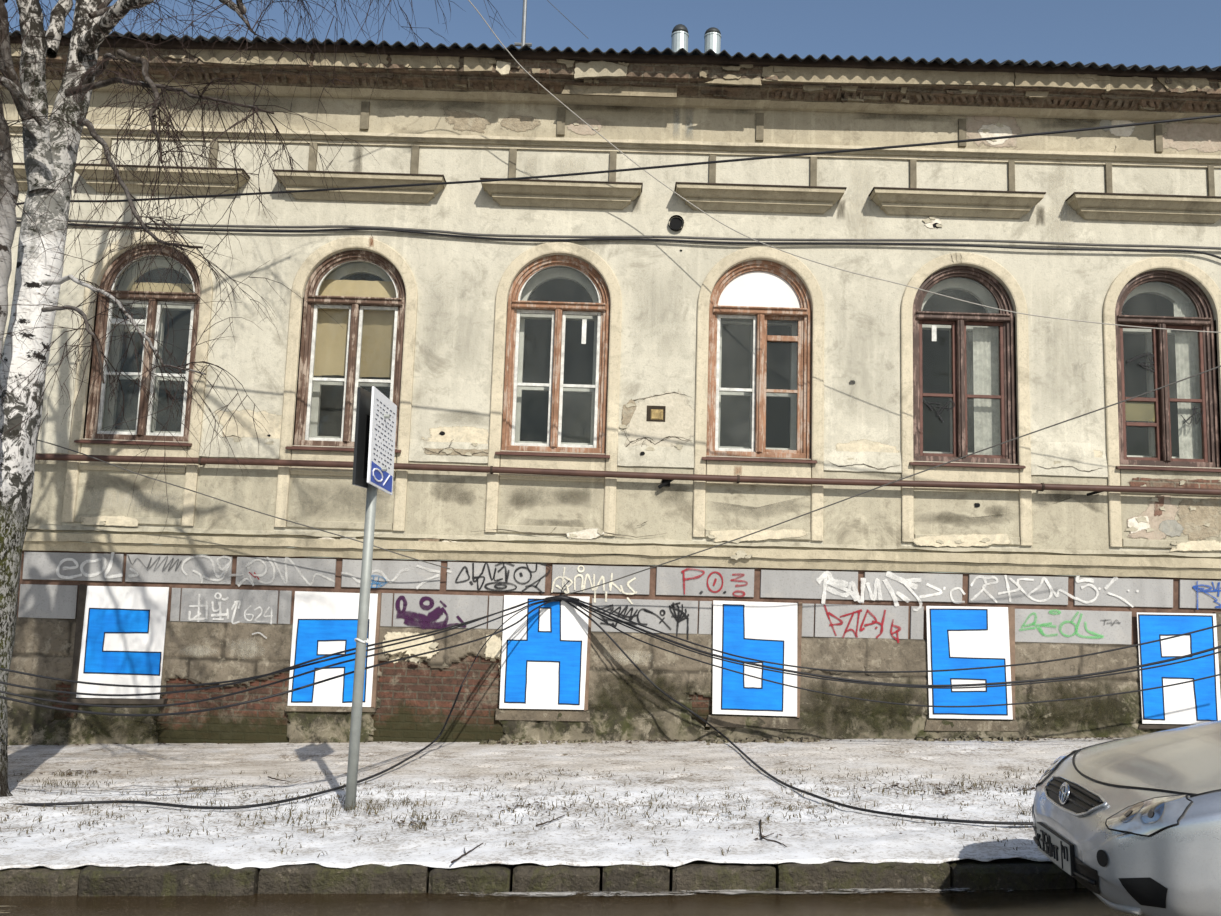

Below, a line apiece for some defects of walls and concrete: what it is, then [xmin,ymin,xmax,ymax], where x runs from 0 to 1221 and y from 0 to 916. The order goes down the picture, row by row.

flaking render [965,116,1022,150]
crack [623,429,692,447]
flaking render [1125,477,1221,552]
spalling [154,671,290,744]
spalling [371,632,505,743]